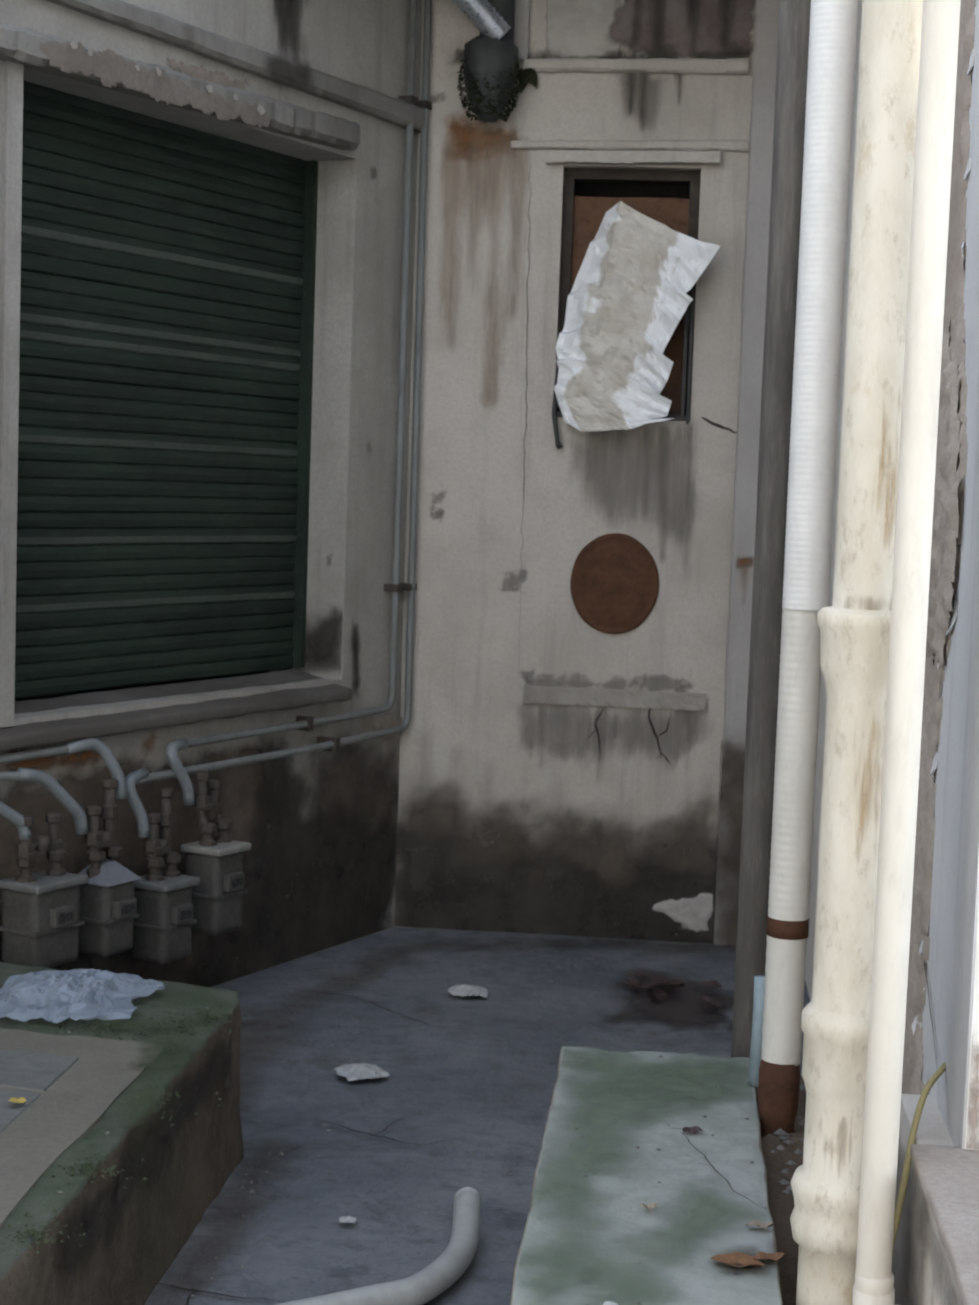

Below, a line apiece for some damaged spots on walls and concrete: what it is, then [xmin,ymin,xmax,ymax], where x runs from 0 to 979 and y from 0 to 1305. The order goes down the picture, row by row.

peeling [40,40,271,128]
damp [600,0,755,118]
corrosion [448,118,515,159]
spalling [901,0,976,1095]
damp [295,611,359,688]
spalling [608,676,687,692]
crack [588,708,604,760]
crack [648,709,672,763]
damp [51,743,745,987]
damp [968,1053,979,1149]
crack [673,1128,788,1236]